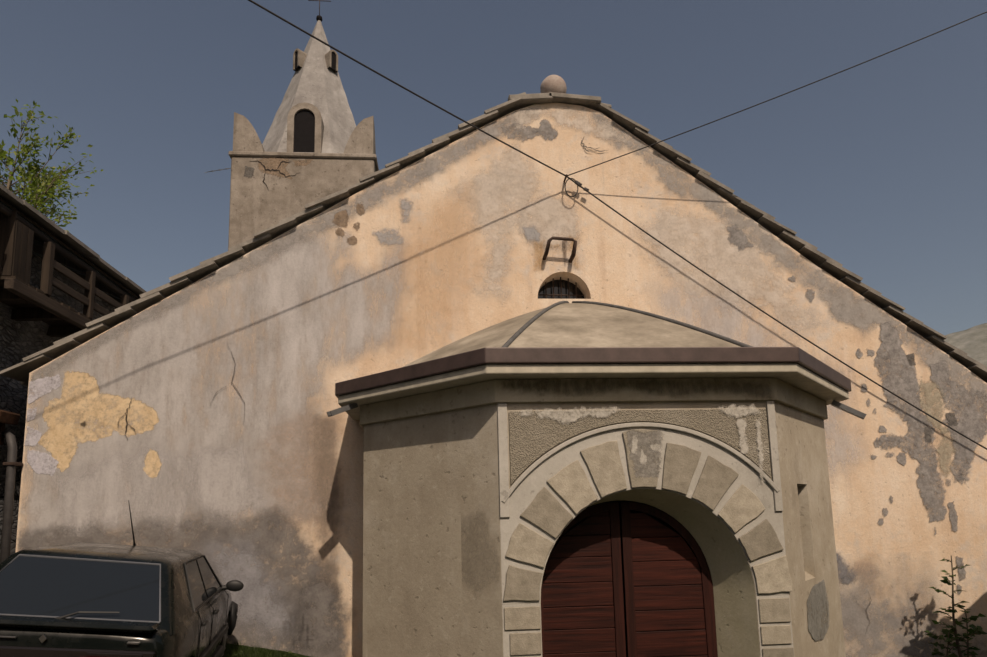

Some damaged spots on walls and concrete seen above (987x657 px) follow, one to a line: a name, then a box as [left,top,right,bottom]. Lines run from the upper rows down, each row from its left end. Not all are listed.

crack [258,161,295,188]
flaking render [333,203,365,245]
damp [19,109,535,657]
peeling [24,371,159,476]
crack [118,397,135,440]
peeling [856,322,987,535]
peeling [143,449,162,478]
spalling [627,429,663,478]
peeling [956,556,966,594]
damp [836,553,983,657]